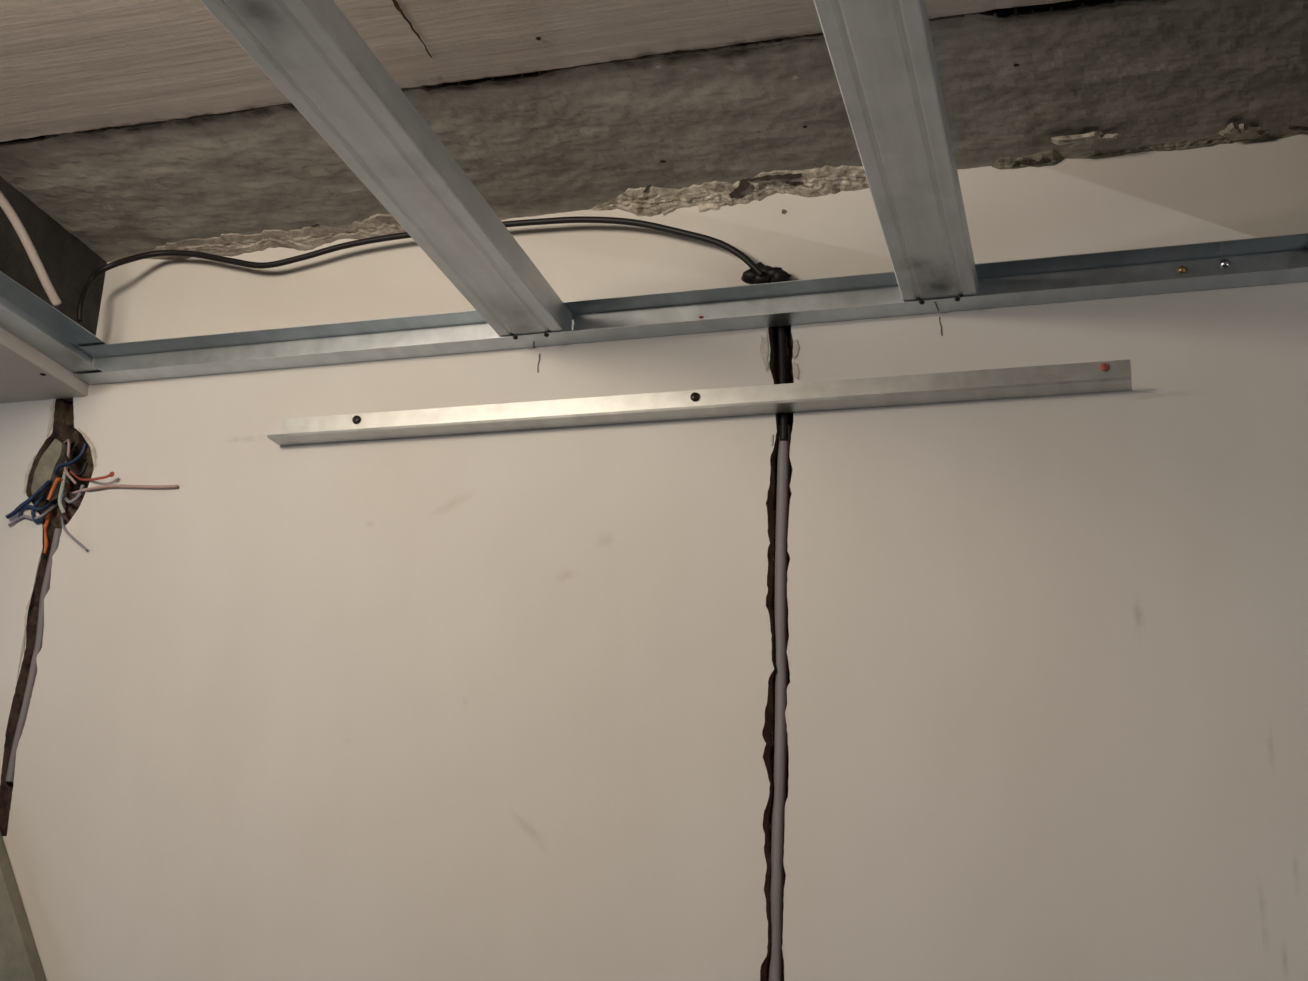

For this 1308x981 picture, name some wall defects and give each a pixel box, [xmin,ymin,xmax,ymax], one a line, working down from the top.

peeling [0,104,406,262]
peeling [401,34,869,220]
peeling [928,0,1308,170]